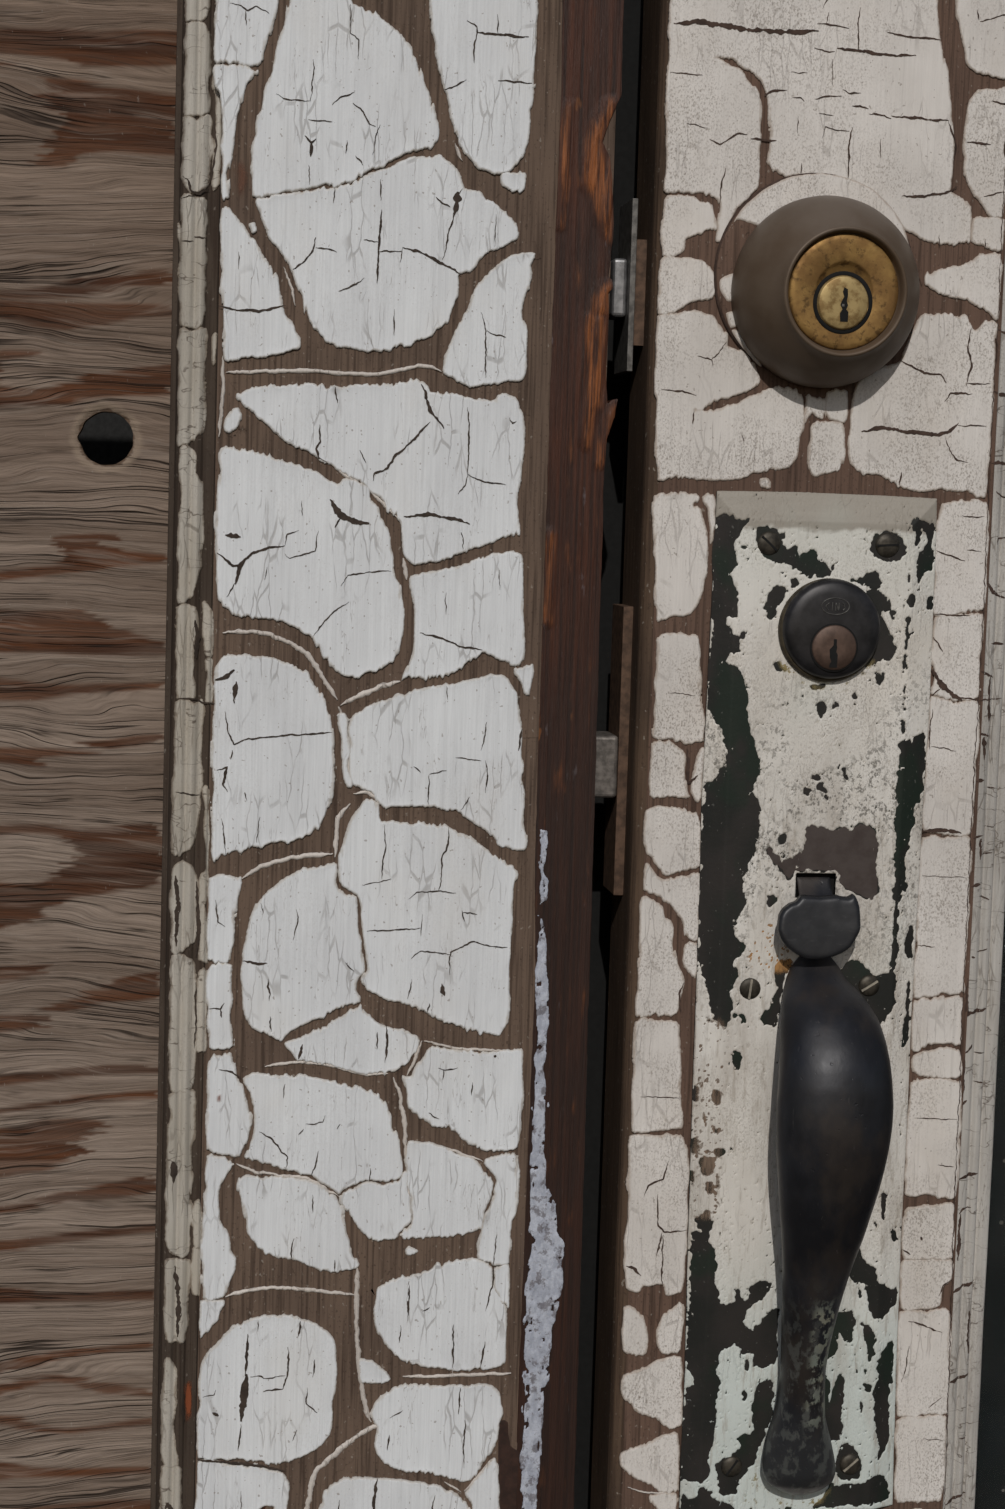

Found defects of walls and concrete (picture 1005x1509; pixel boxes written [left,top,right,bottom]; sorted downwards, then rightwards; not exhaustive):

crack [170,1162,178,1183]
crack [173,0,541,1509]
peeling [159,0,565,1509]
crack [622,854,699,1509]
peeling [619,0,1005,1509]
crack [647,0,1005,1509]